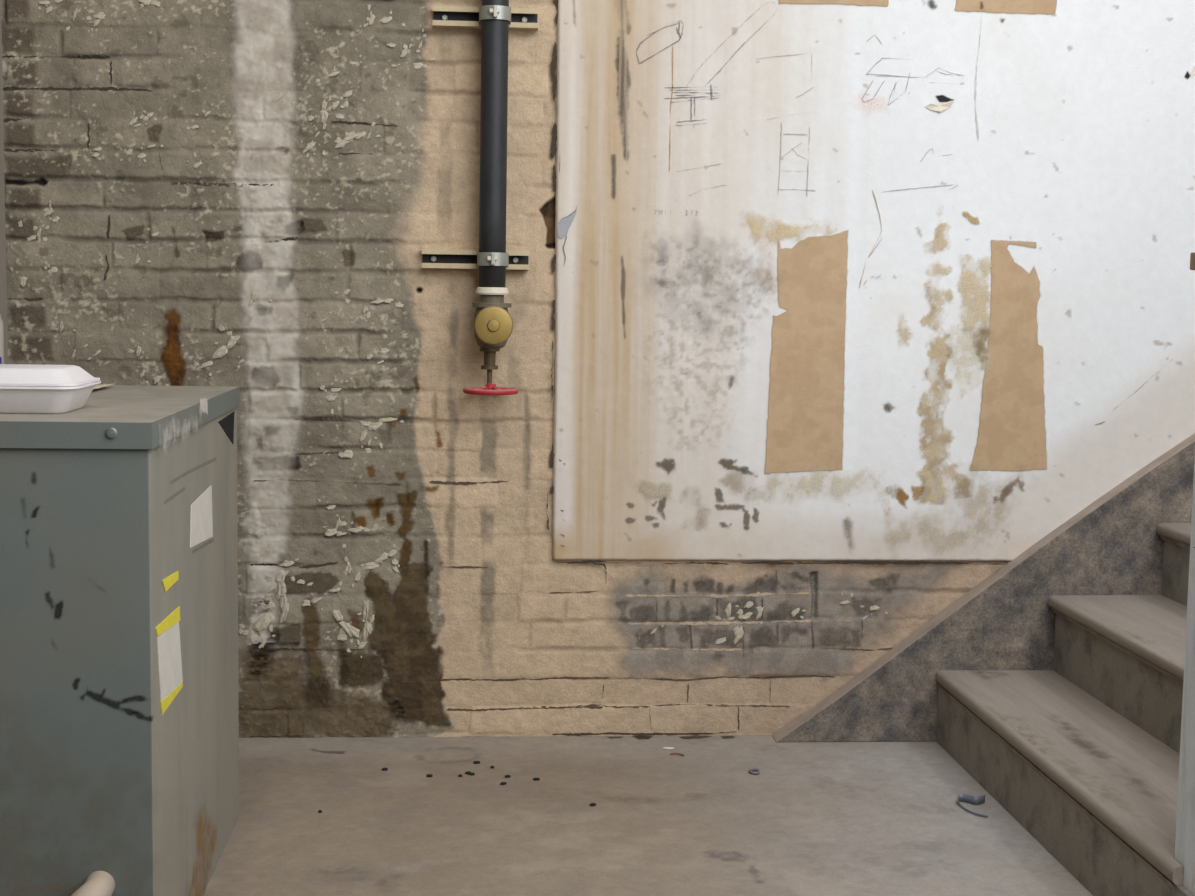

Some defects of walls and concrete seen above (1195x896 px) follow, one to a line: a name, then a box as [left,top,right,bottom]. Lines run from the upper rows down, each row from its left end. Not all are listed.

peeling [955,0,1057,14]
peeling [301,90,381,157]
leakage [748,217,799,241]
corrosion [161,309,186,386]
peeling [193,324,245,376]
peeling [765,230,848,474]
leakage [948,255,992,377]
peeling [970,240,1047,471]
peeling [338,417,404,458]
spalling [715,488,759,529]
peeling [238,499,400,658]
leakage [239,491,450,738]